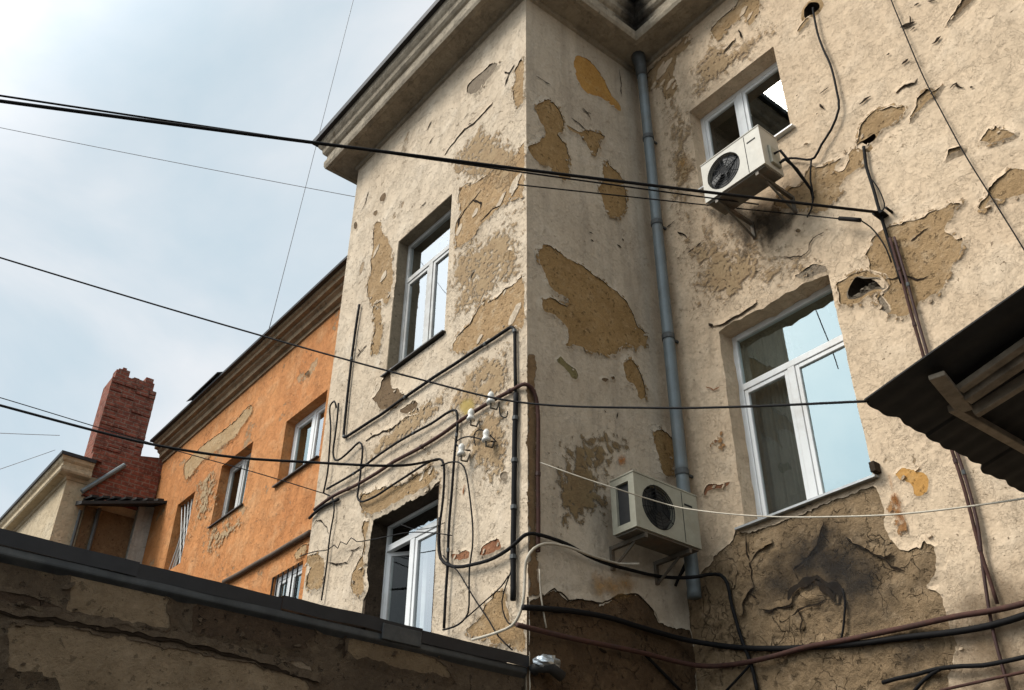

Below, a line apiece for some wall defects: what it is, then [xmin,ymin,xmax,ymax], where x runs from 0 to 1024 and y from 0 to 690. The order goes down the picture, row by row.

crack [427,65,514,155]
spalling [647,0,1024,324]
peeling [365,191,397,359]
leakage [710,206,793,257]
spalling [370,52,967,690]
peeling [183,402,255,556]
crack [737,537,842,634]
crack [807,521,904,571]
crack [0,600,322,683]